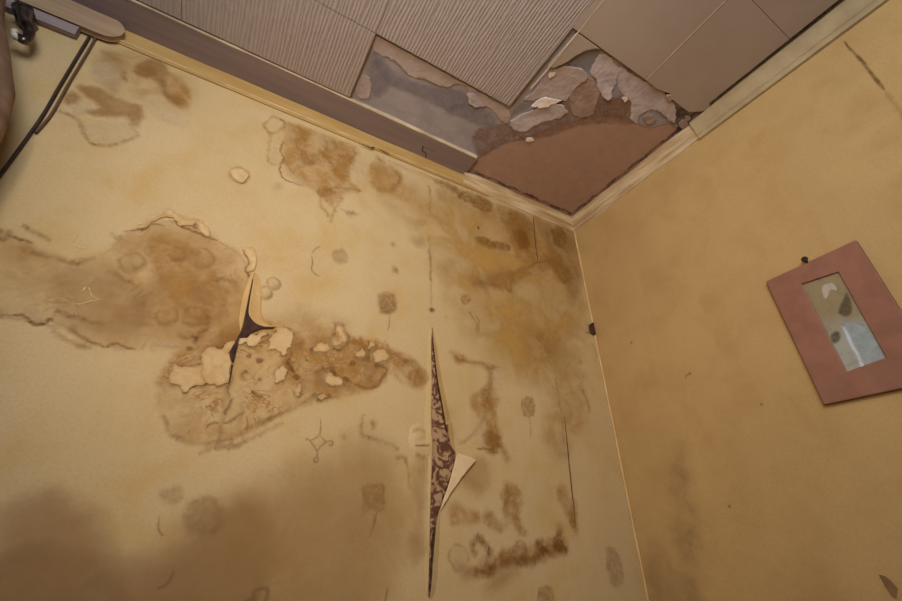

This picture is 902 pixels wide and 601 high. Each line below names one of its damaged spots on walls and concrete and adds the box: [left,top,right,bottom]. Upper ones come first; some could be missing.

flaking render [372,35,679,217]
water stain [430,213,576,367]
peeling [169,327,293,393]
peeling [313,326,346,352]
peeling [318,372,343,400]
water stain [286,338,399,399]
peeling [356,342,390,362]